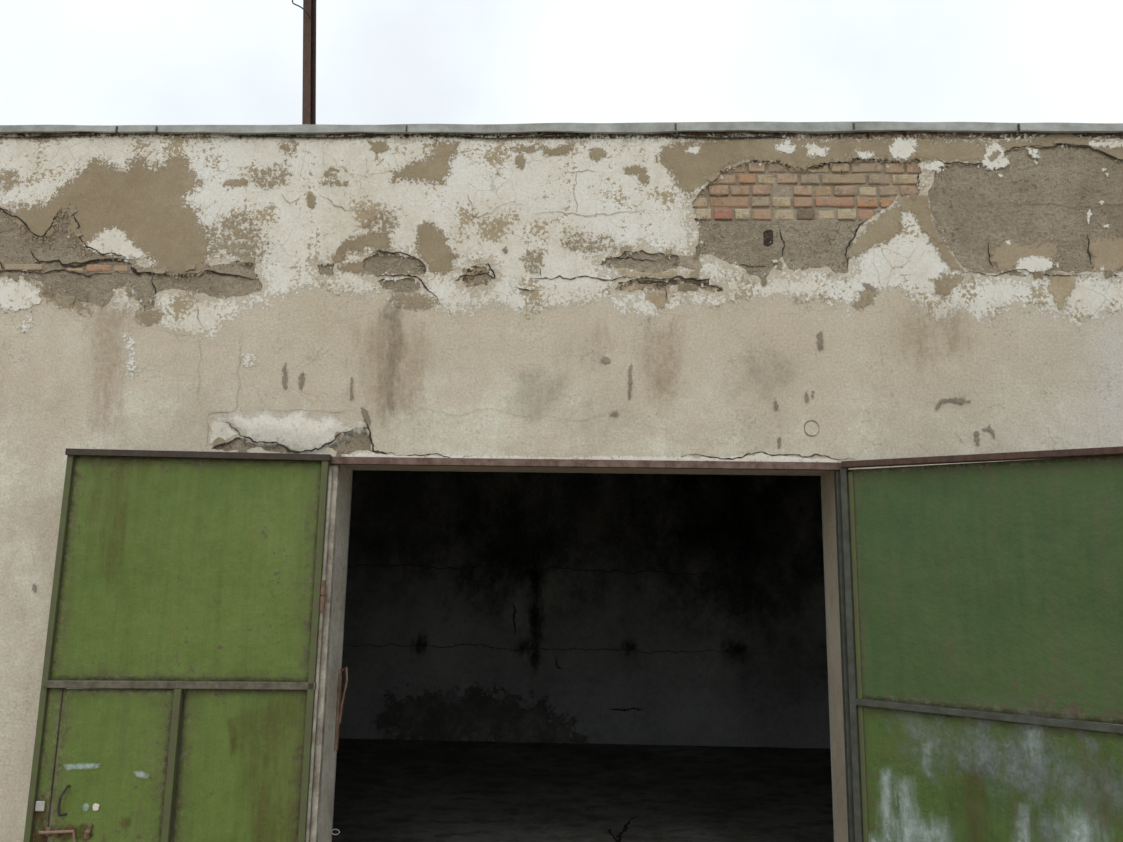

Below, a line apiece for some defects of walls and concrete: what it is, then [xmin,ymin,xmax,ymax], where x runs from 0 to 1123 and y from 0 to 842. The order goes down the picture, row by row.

peeling [220,137,301,194]
peeling [507,141,608,170]
crack [747,133,1123,194]
peeling [0,150,271,379]
peeling [502,247,545,273]
flaking render [558,132,1123,312]
crack [845,220,865,271]
crack [966,235,1119,276]
flaking render [209,420,303,454]
flaking render [324,377,372,457]
water stain [375,672,589,744]